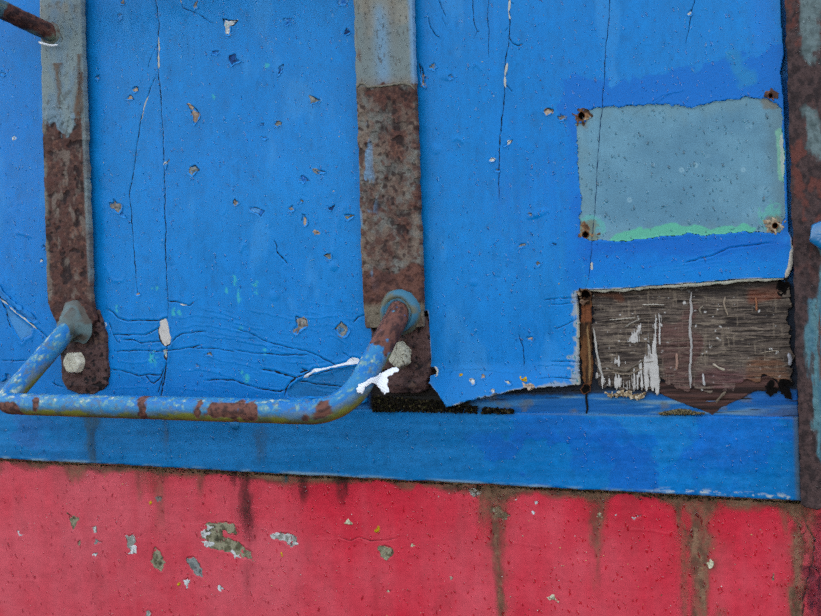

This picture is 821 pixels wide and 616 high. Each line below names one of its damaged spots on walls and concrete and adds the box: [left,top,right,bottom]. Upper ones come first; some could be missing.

peeling [222,18,238,36]
crack [472,0,522,186]
peeling [575,97,786,242]
crack [107,0,351,395]
crack [0,297,47,337]
peeling [158,319,171,360]
peeling [292,316,308,335]
peeling [587,246,793,396]
peeling [126,535,137,555]
peeling [201,521,254,561]
peeling [270,531,298,547]
peeling [183,556,203,589]